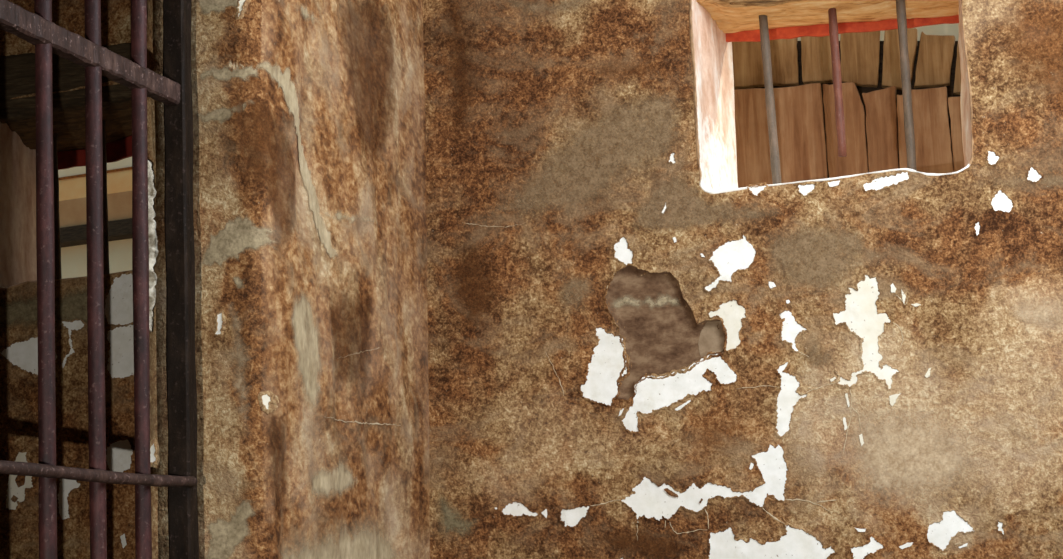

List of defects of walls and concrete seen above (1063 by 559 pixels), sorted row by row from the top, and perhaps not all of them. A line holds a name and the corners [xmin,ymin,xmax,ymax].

peeling [984,150,1003,168]
peeling [1025,164,1045,185]
peeling [0,335,38,379]
peeling [104,271,134,381]
spalling [578,232,759,436]
peeling [830,273,921,430]
peeling [619,300,811,525]
peeling [4,474,35,513]
peeling [57,464,82,521]
peeling [495,498,591,529]
peeling [706,523,886,559]
peeling [899,508,976,554]